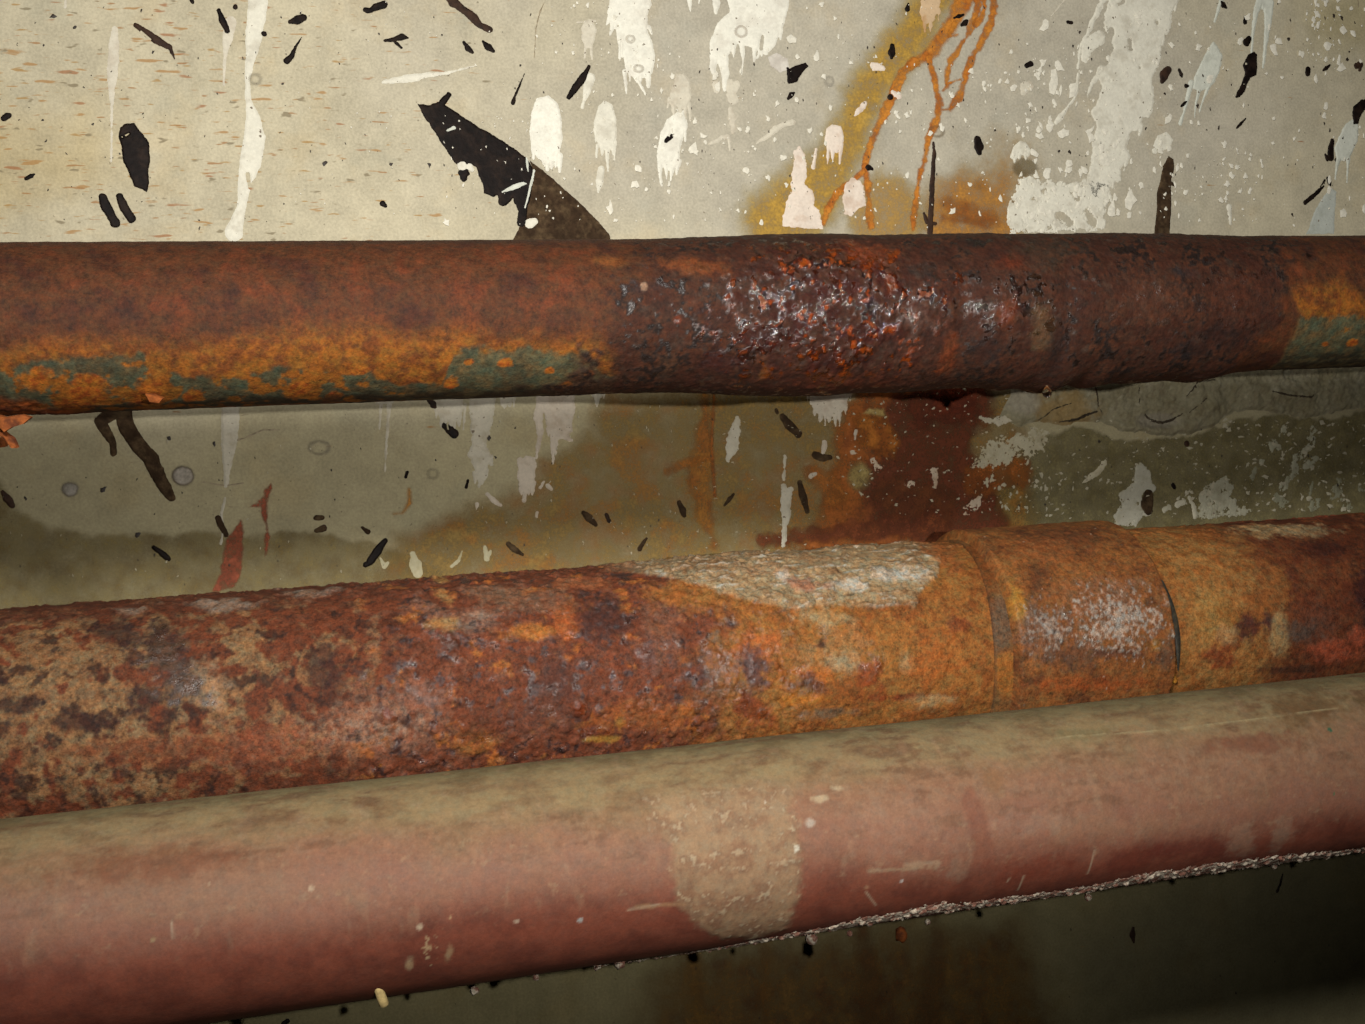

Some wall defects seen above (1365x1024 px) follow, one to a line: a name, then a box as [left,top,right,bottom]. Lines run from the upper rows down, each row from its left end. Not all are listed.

corrosion [745,0,1018,235]
corrosion [393,388,1031,579]
spalling [1000,367,1365,437]